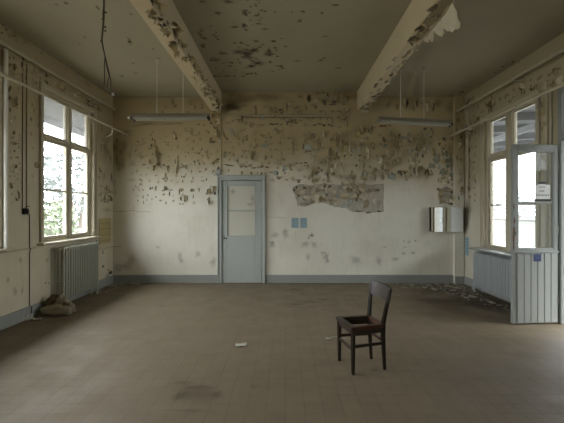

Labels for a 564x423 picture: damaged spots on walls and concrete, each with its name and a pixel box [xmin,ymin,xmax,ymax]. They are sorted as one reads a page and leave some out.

peeling [9,130,22,203]
spalling [132,0,563,214]